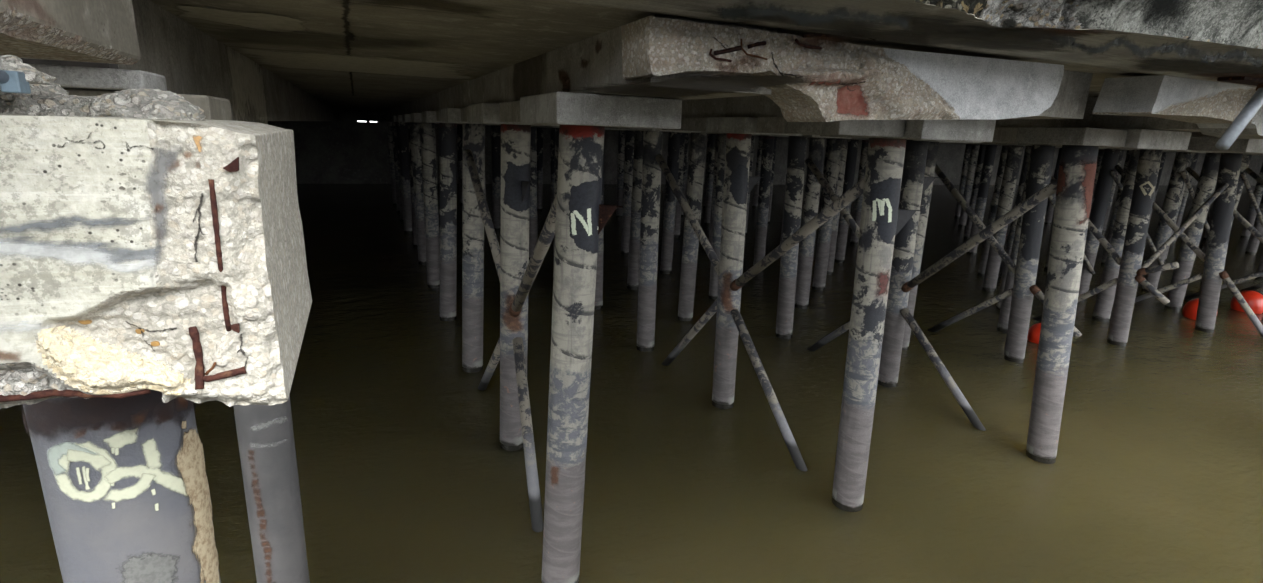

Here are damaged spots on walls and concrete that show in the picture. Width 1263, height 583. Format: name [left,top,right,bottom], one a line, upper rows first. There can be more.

crack [341,0,355,95]
rust [223,157,239,172]
spalling [0,120,312,409]
crack [193,193,204,262]
rust [22,389,196,437]
peeling [176,420,220,583]